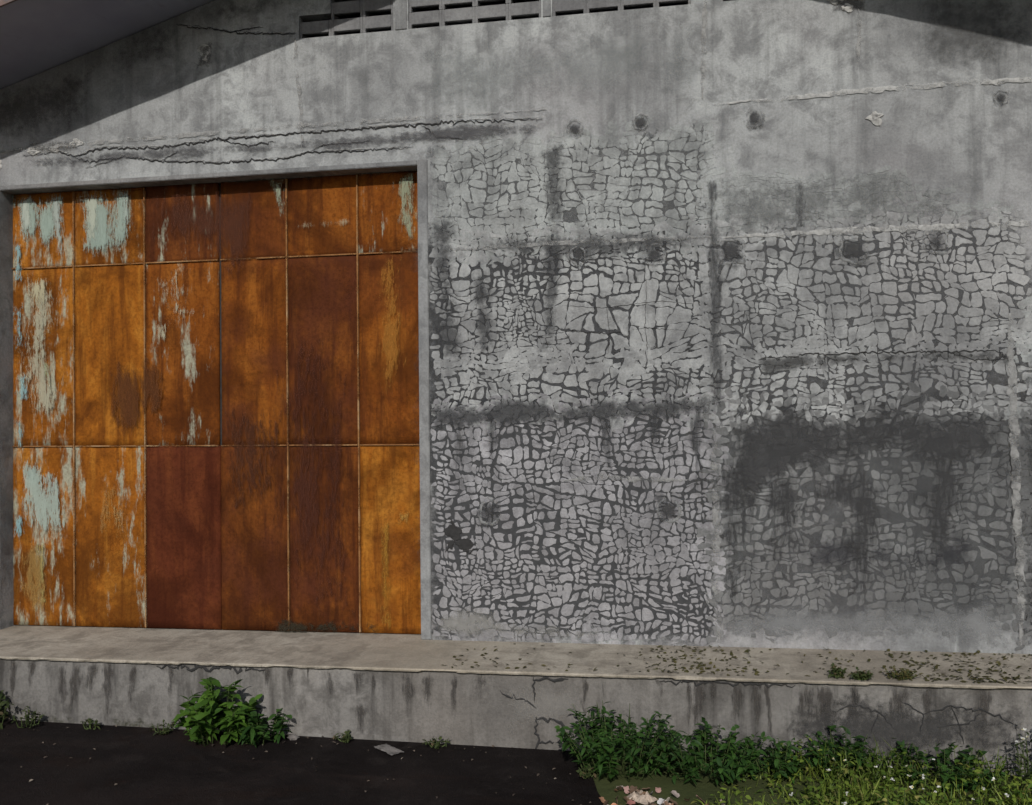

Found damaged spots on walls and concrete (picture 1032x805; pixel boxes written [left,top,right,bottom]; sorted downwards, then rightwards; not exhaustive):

crack [24,117,541,168]
peeling [83,191,130,253]
peeling [12,193,64,415]
corrosion [383,261,400,377]
crack [538,281,692,350]
crack [763,349,1016,363]
corrosion [111,359,163,431]
damp [720,407,996,574]
peeling [14,460,65,603]
corrosion [278,620,353,633]
damp [59,665,111,711]
crack [501,676,574,749]